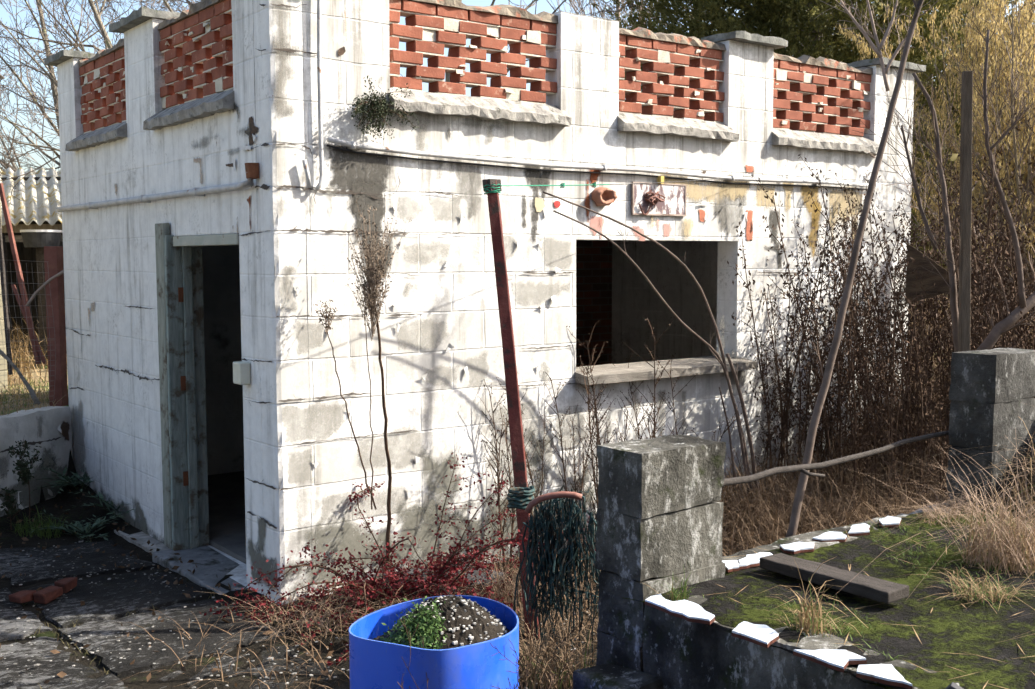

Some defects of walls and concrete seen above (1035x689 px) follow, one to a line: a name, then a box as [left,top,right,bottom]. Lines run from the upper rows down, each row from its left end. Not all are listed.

leakage [327,145,393,277]
crack [95,365,159,383]
leakage [0,403,88,517]
leakage [93,489,164,544]
leakage [248,455,520,594]
leakage [526,432,595,535]